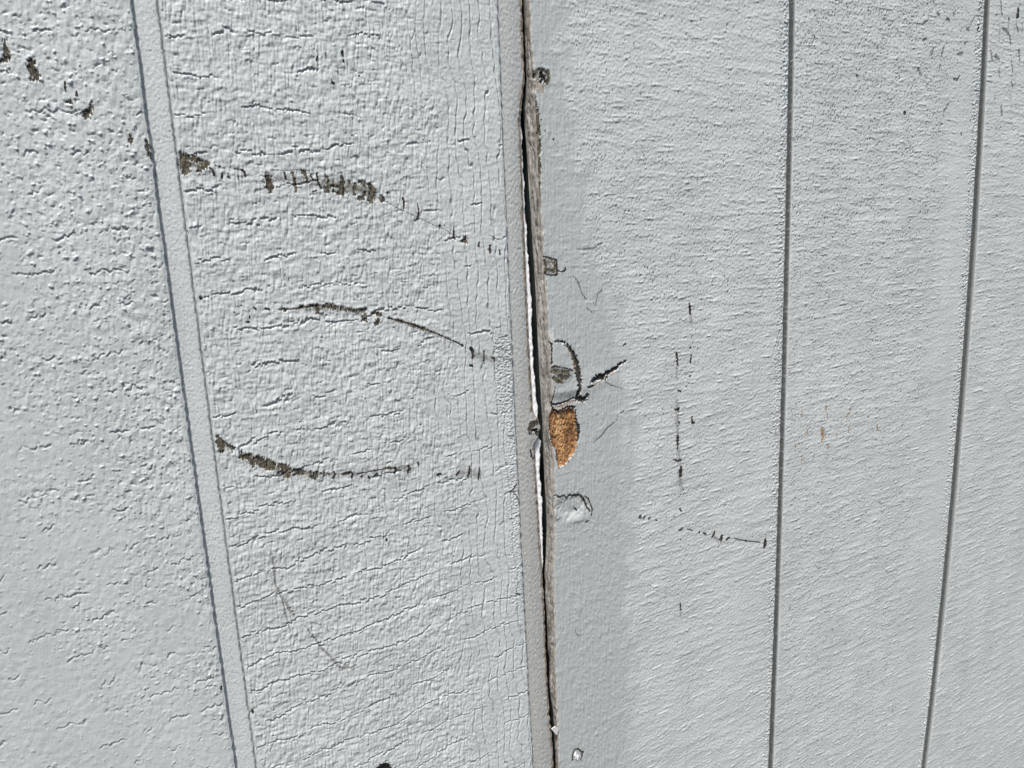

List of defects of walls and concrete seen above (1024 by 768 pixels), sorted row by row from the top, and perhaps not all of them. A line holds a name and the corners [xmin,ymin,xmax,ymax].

peeling [0,38,11,63]
peeling [26,58,41,82]
peeling [64,81,94,120]
peeling [178,151,246,180]
peeling [264,168,501,255]
crack [234,302,495,367]
peeling [548,339,590,411]
peeling [215,435,419,481]